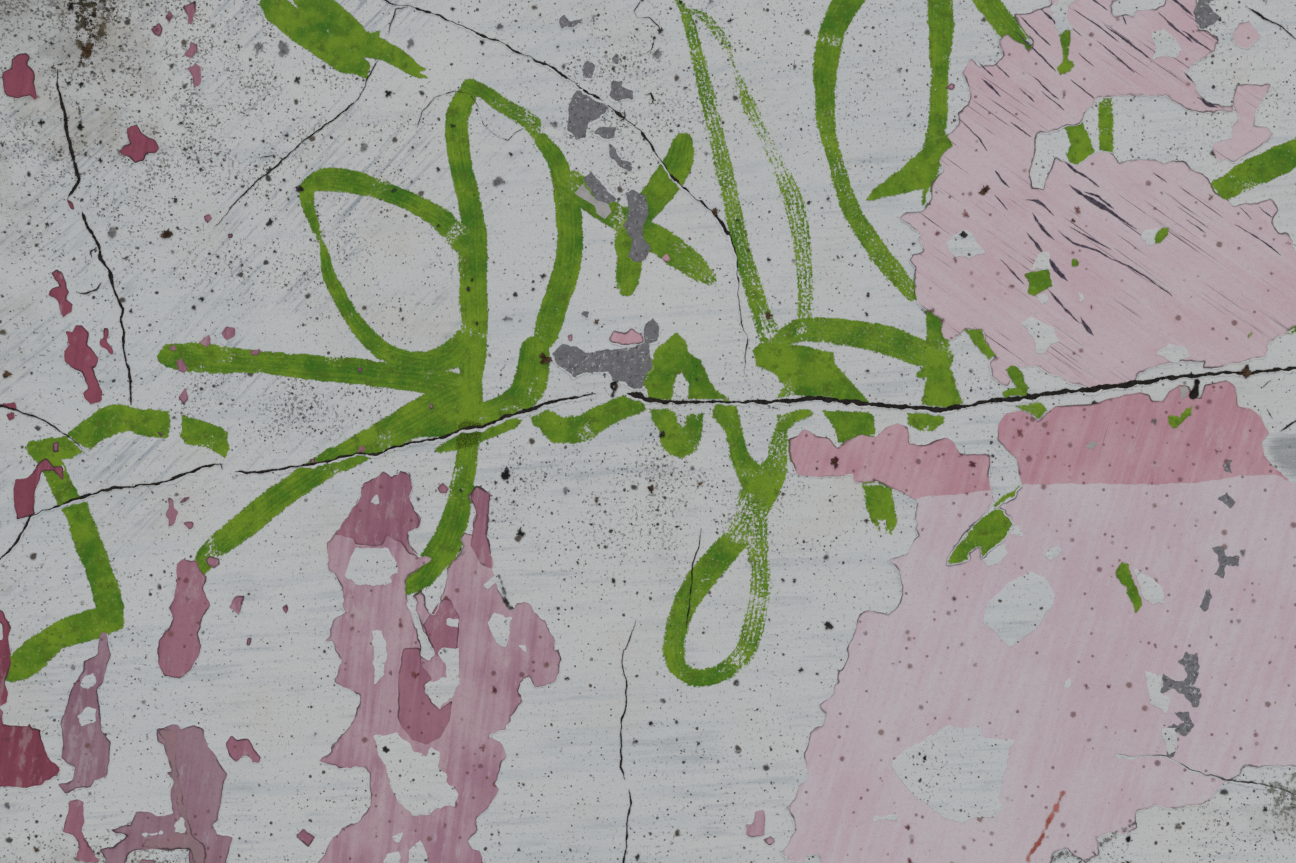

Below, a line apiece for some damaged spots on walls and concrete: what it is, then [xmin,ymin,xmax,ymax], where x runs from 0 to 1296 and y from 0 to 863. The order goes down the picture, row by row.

peeling [2,53,38,101]
peeling [119,124,160,164]
peeling [48,268,114,405]
peeling [170,345,188,405]
crack [0,0,1296,565]
peeling [745,0,1296,863]
peeling [156,556,219,679]
peeling [230,596,244,614]
peeling [296,466,570,863]
crack [686,532,701,627]
crack [620,621,636,863]
crack [1115,754,1296,796]